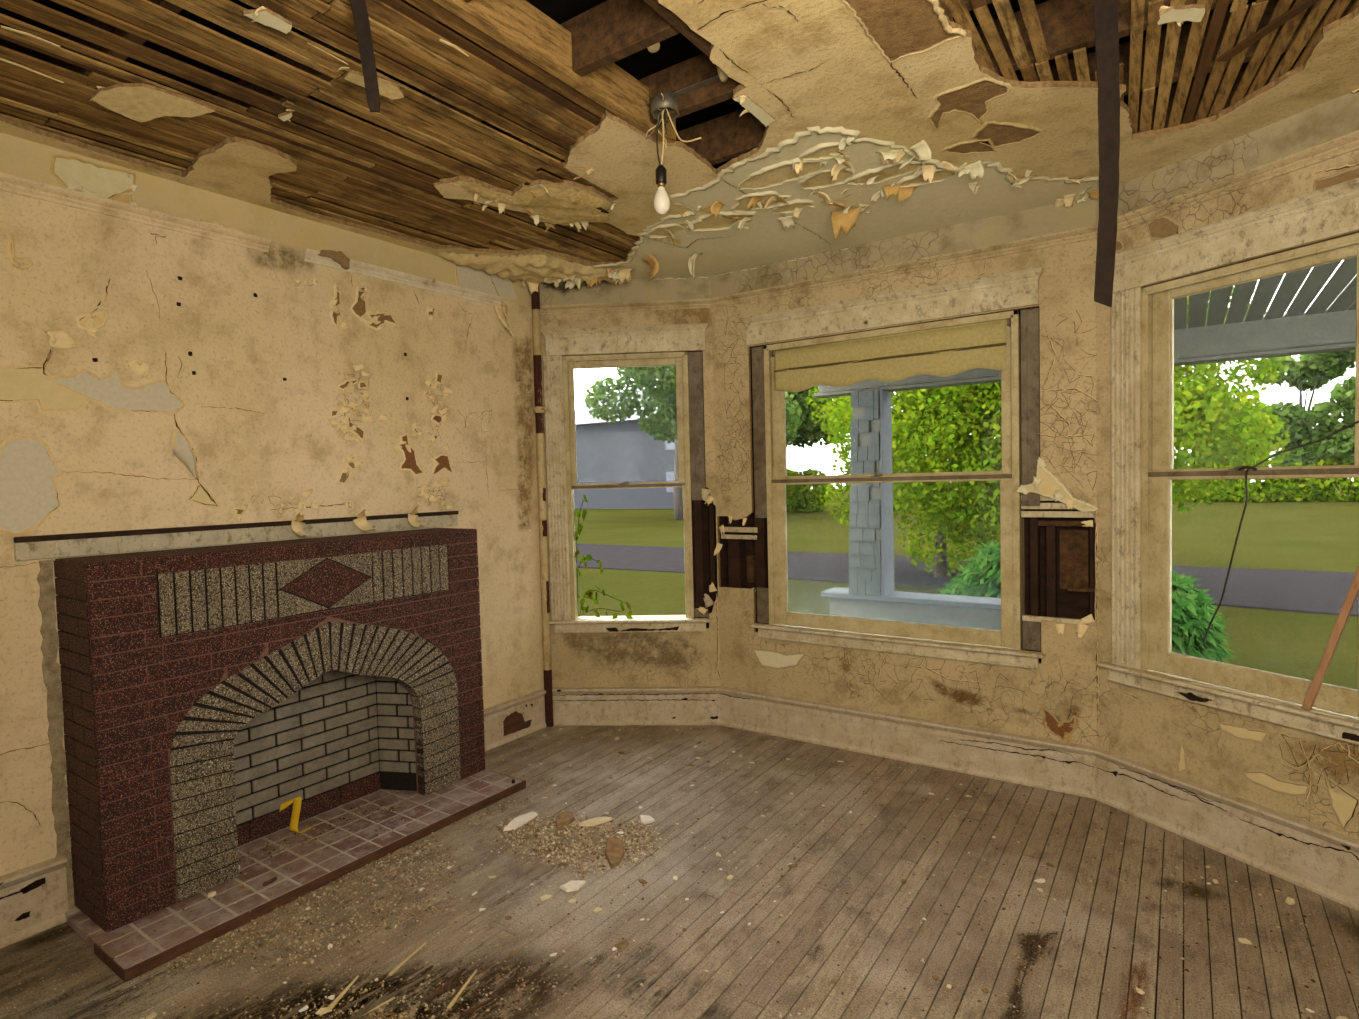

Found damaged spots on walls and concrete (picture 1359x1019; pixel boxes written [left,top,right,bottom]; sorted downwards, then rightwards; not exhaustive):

crack [698,0,829,118]
spalling [839,0,968,63]
peeling [50,155,137,206]
peeling [474,184,589,232]
peeling [593,77,1099,280]
peeling [328,283,397,330]
peeling [0,435,66,535]
peeling [50,359,249,522]
crack [67,353,264,500]
peeling [329,362,392,485]
peeling [393,372,453,509]
crack [1279,734,1359,807]